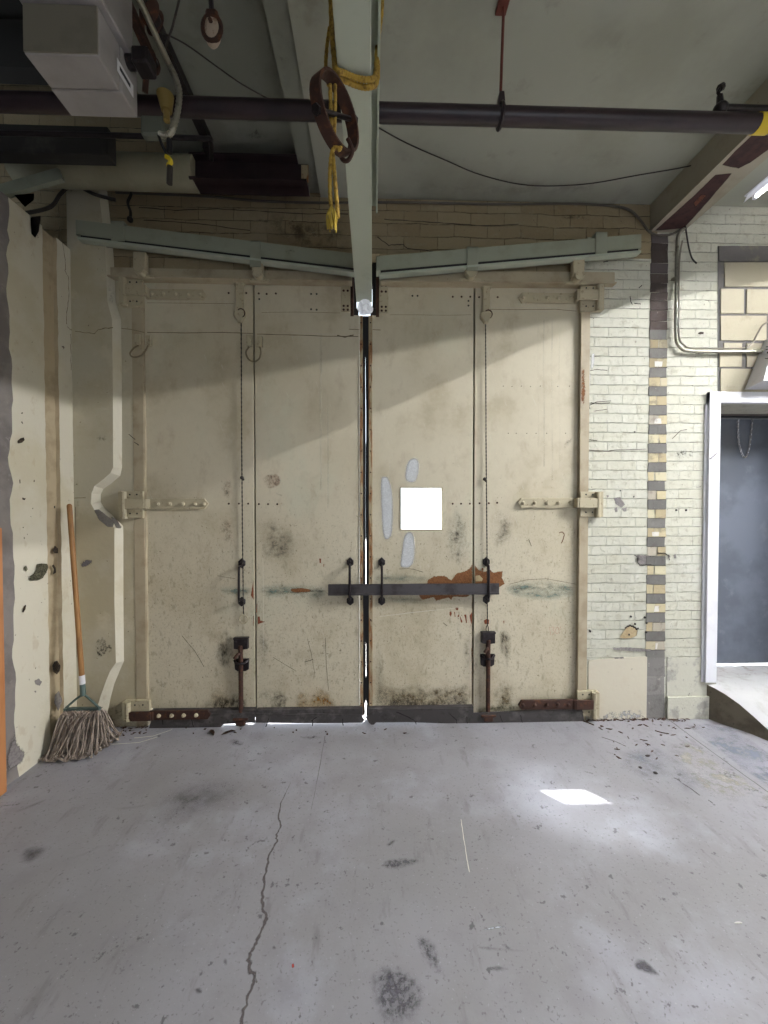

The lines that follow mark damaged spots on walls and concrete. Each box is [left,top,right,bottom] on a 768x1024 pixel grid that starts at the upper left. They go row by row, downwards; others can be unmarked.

crack [240,787,289,1024]
water stain [380,971,416,1016]